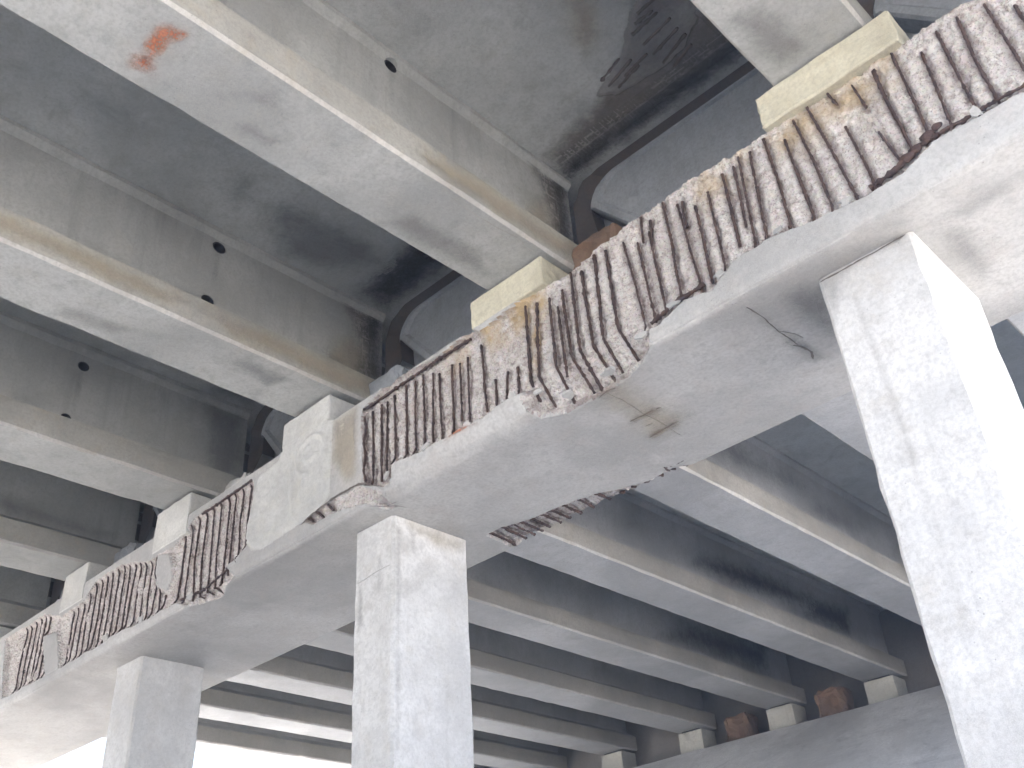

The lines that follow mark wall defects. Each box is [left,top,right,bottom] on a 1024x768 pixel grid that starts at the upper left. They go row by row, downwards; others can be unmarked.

rust [135,28,185,70]
rust [556,15,740,177]
spalling [305,0,1024,524]
crack [747,307,814,360]
spalling [489,461,688,546]
spalling [1,479,254,699]